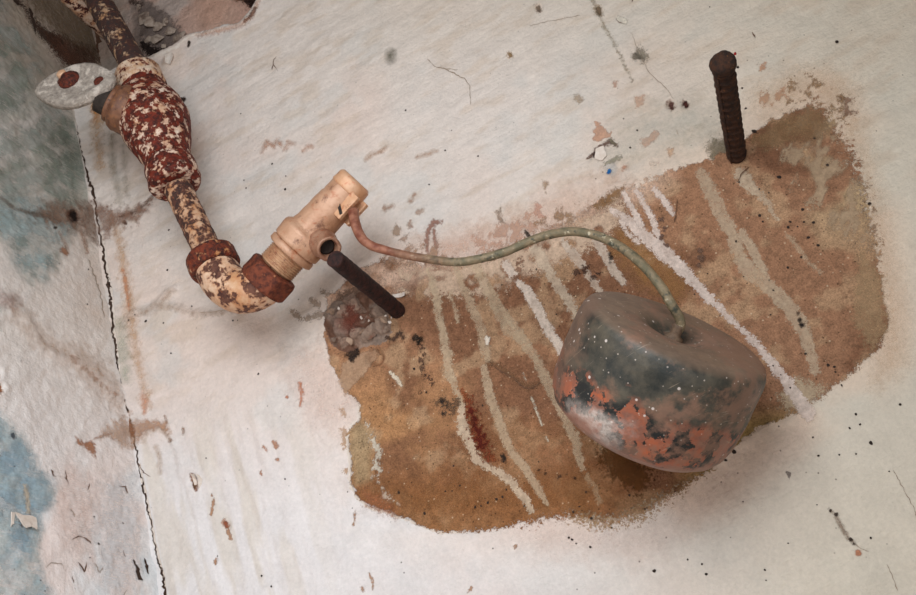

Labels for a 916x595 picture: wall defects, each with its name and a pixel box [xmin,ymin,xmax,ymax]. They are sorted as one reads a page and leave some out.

spalling [92,30,118,70]
spalling [113,0,260,59]
leakage [733,168,780,221]
leakage [474,208,578,354]
flaking render [290,50,889,535]
leakage [561,229,627,292]
leakage [592,178,819,422]
crack [77,126,167,595]
leakage [381,241,547,514]
leakage [564,469,715,534]
crack [50,509,103,583]